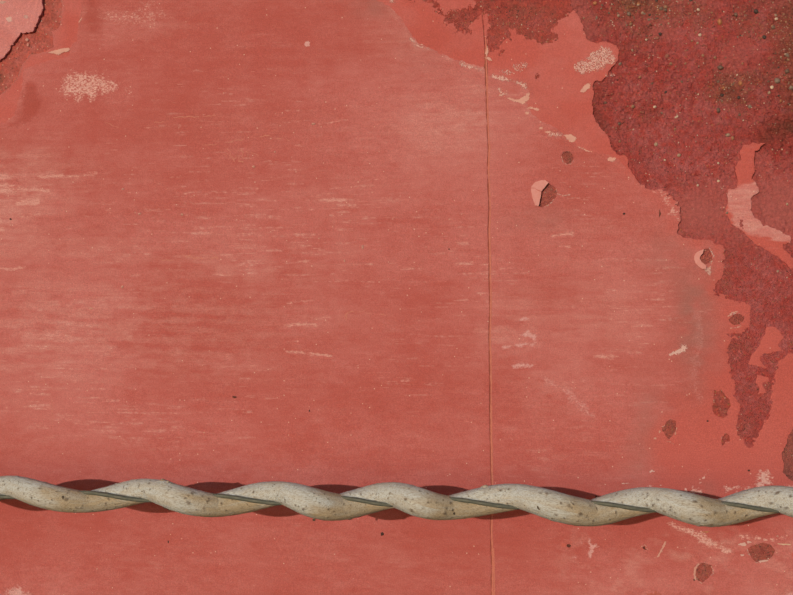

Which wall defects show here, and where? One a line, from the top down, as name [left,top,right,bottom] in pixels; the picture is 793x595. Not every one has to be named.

flaking render [0,0,82,124]
crack [484,38,493,485]
flaking render [377,0,793,448]
flaking render [782,429,793,481]
crack [488,514,496,595]
peeling [693,562,714,584]
peeling [738,541,775,563]